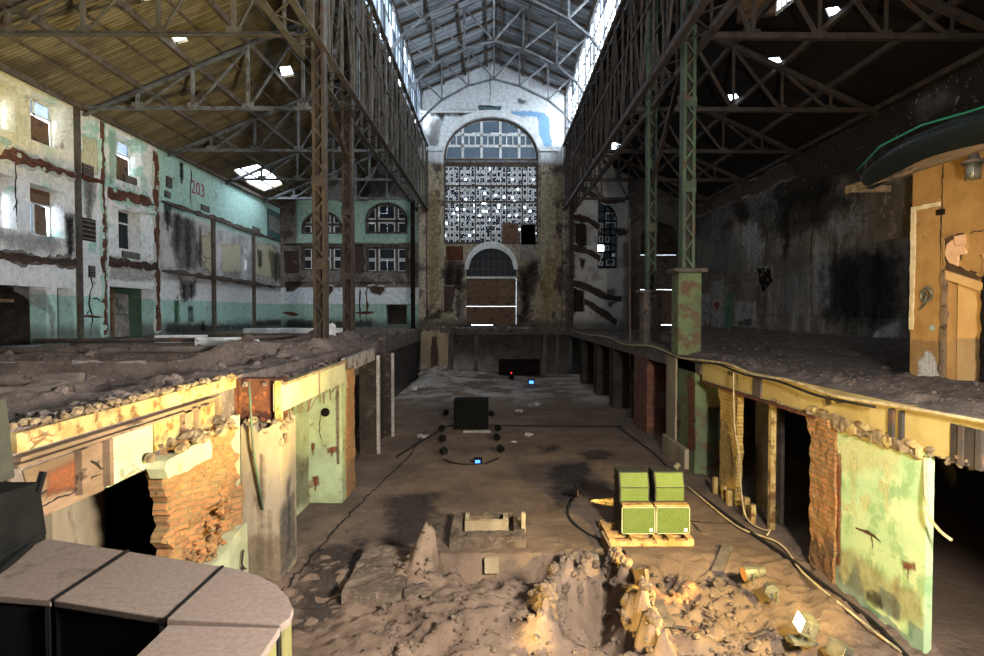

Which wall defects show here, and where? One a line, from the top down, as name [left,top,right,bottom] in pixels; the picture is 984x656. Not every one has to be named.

spalling [0,120,162,338]
water stain [166,211,241,334]
water stain [814,208,900,338]
spalling [288,400,310,516]
spalling [805,406,935,654]